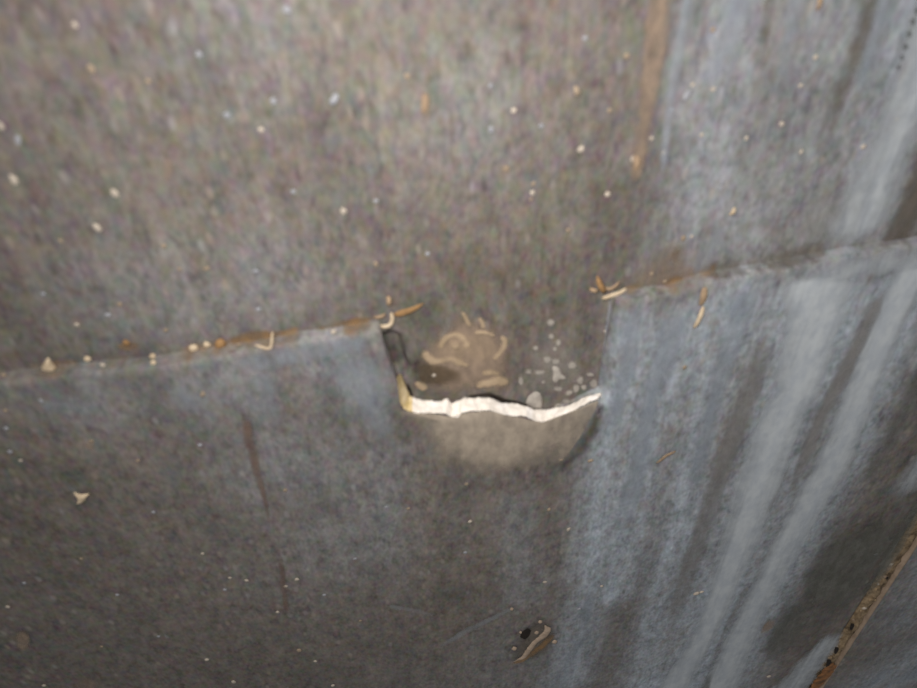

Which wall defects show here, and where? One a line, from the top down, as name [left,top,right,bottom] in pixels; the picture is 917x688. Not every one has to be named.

leakage [634,0,667,177]
leakage [834,37,917,241]
spalling [397,320,602,469]
leakage [659,253,917,688]